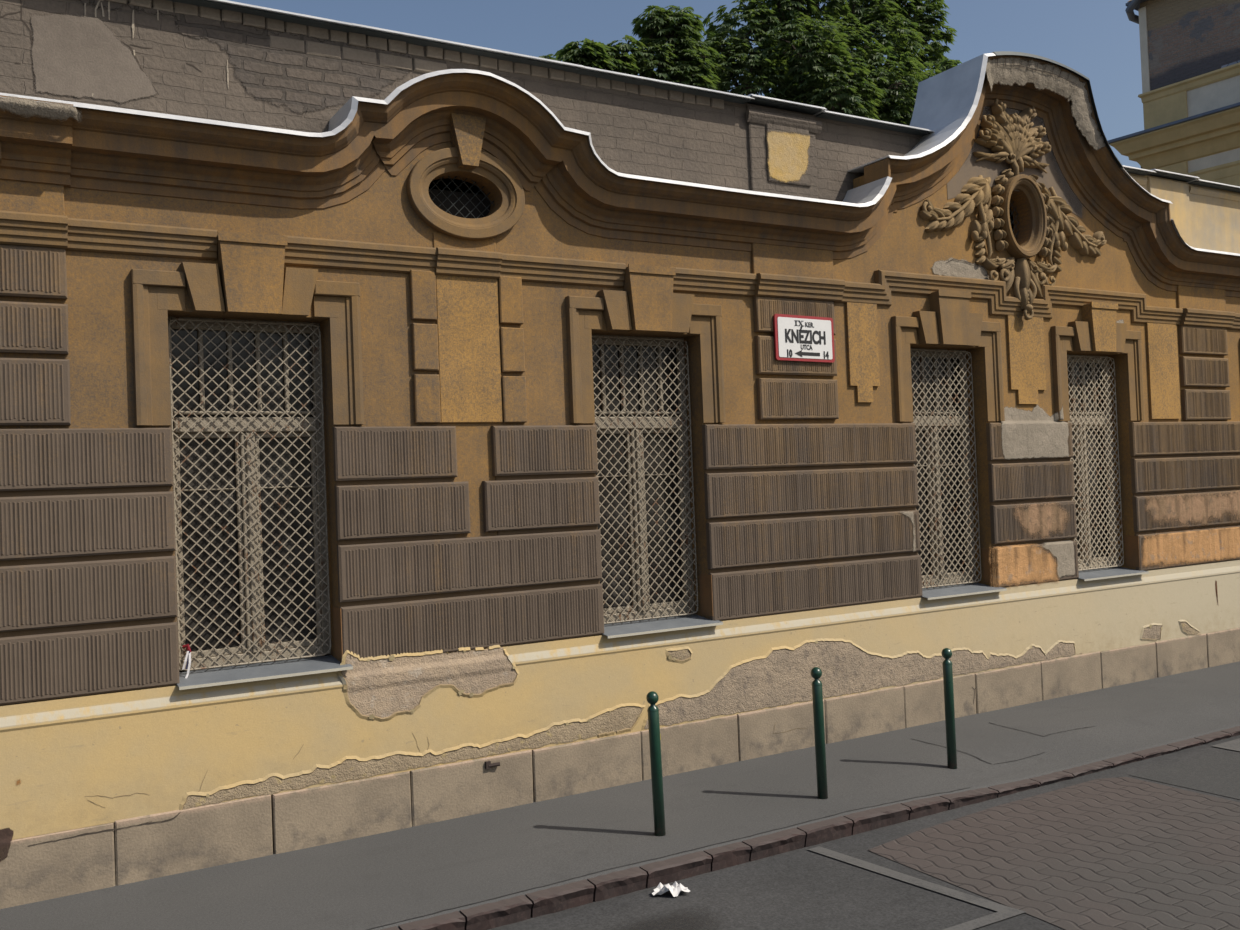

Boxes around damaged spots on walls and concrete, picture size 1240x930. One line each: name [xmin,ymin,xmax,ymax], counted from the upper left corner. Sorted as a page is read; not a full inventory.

flaking render [0,0,410,121]
peeling [990,502,1068,587]
peeling [1142,491,1240,566]
spalling [179,638,1081,810]